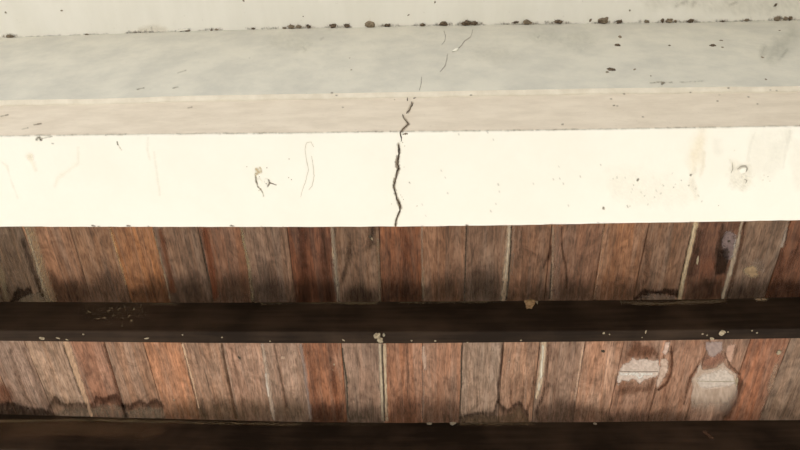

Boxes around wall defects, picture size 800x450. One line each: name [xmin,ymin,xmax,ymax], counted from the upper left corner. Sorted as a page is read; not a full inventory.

crack [436,23,482,72]
crack [375,77,422,227]
damp [0,341,163,418]
damp [460,347,528,423]
peeling [617,342,673,406]
peeling [684,342,740,403]